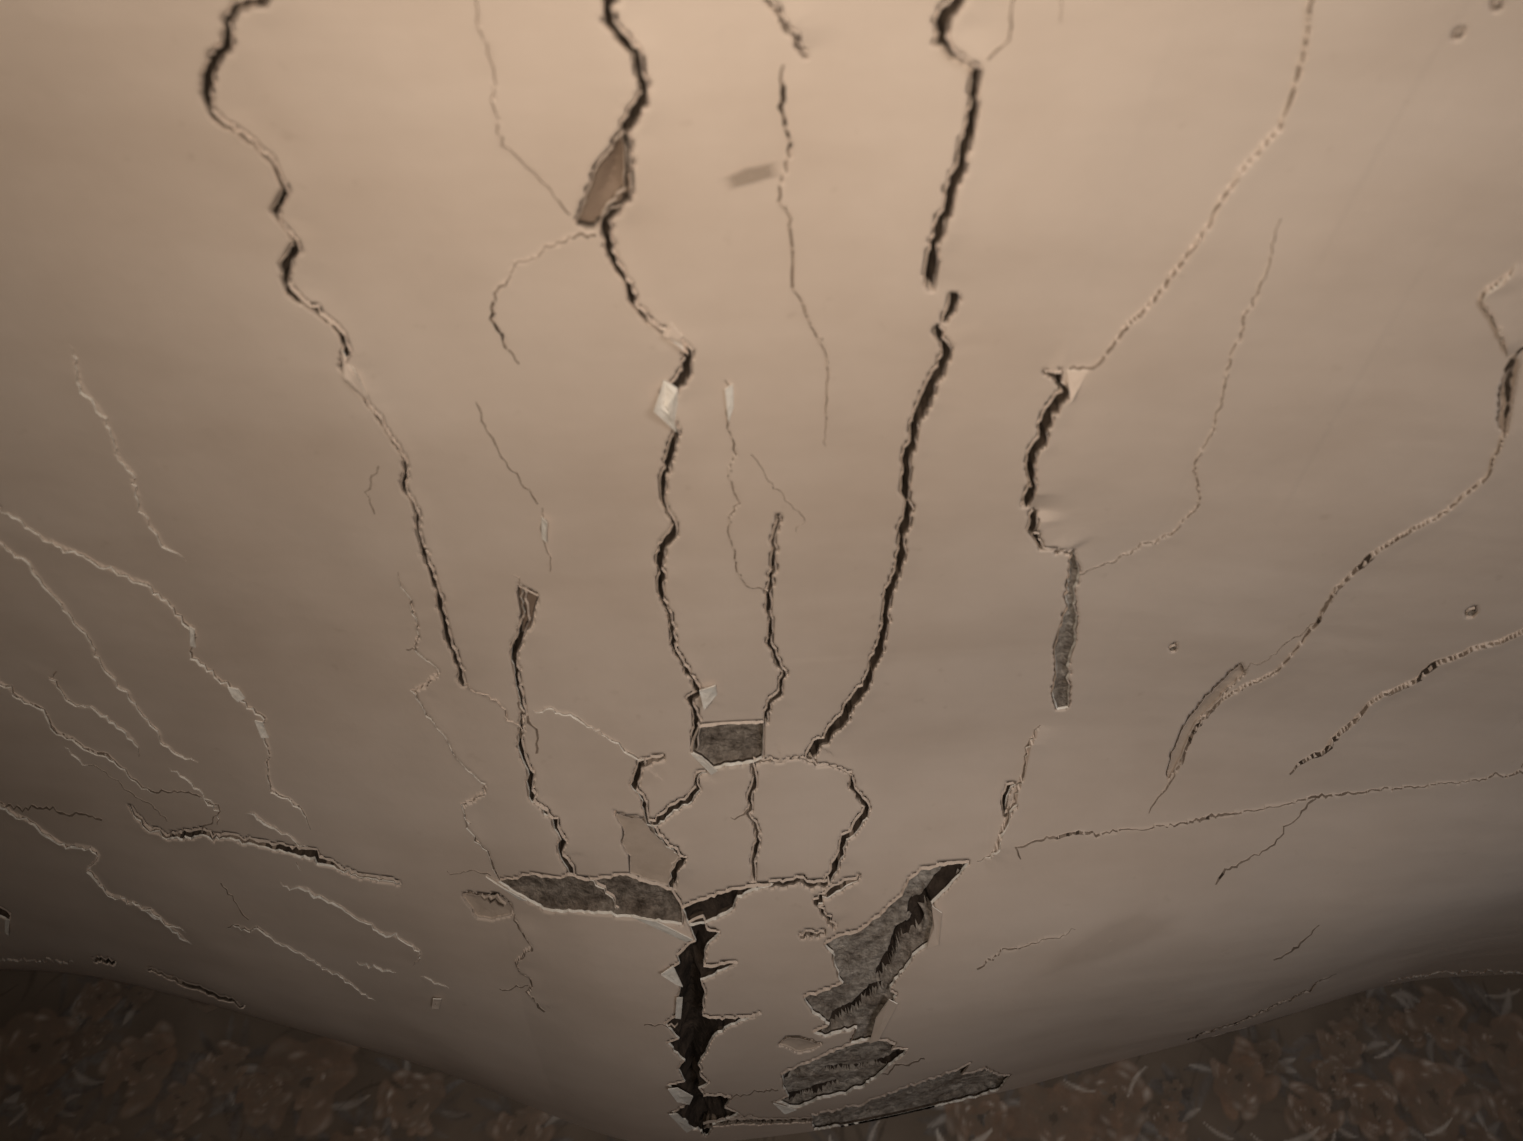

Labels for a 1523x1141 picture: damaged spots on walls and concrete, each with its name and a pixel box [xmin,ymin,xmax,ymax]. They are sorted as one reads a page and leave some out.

peeling [575,127,631,227]
crack [1020,0,1314,575]
crack [70,345,186,562]
crack [202,0,1014,939]
flaking render [1051,550,1080,710]
crack [977,263,1523,885]
crack [0,510,449,1009]
flaking render [690,720,765,775]
crack [499,914,545,1012]
flaking render [486,814,1010,1136]
crack [976,928,1075,970]
crack [703,1111,813,1129]